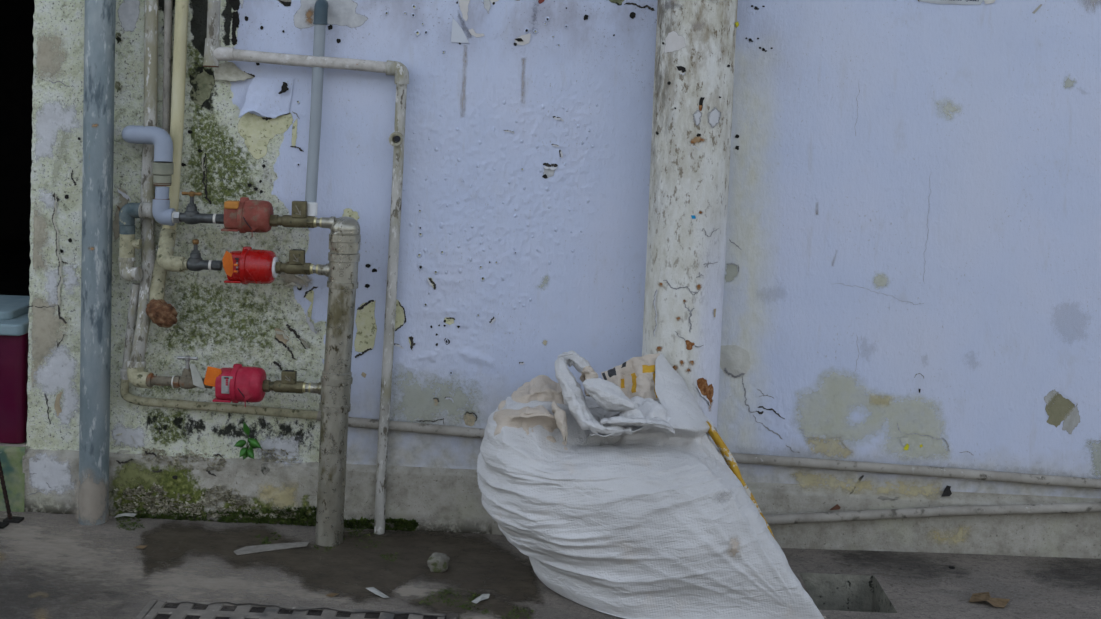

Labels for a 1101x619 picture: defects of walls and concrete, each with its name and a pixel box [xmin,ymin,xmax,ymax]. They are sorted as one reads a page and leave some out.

peeling [214,62,304,159]
spalling [354,284,377,358]
spalling [395,299,415,350]
crack [742,377,864,494]
peeling [1044,390,1080,434]